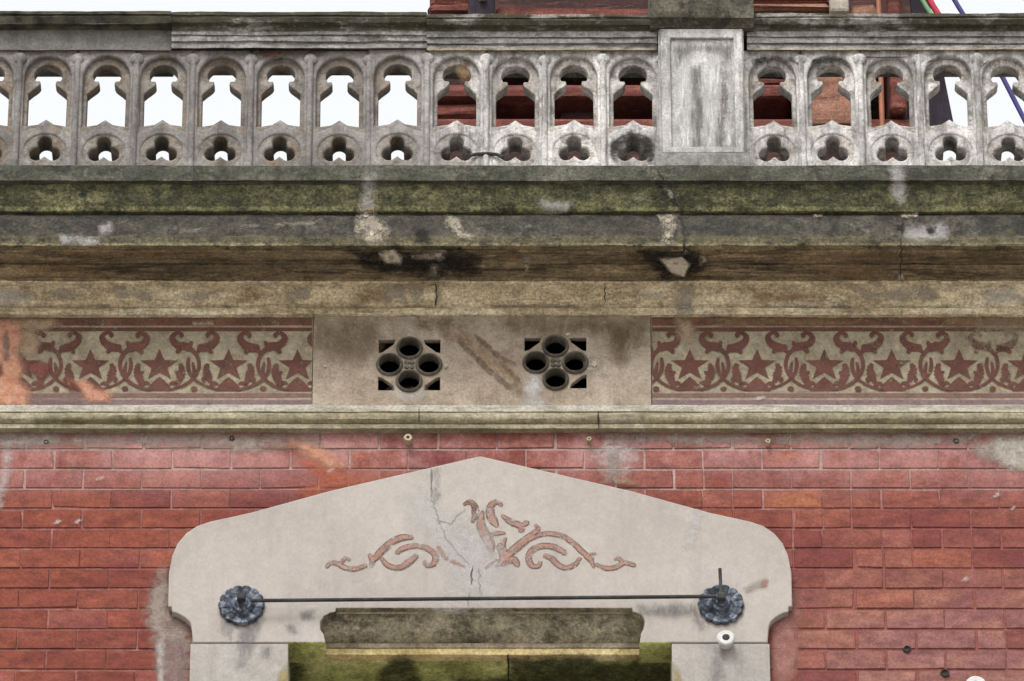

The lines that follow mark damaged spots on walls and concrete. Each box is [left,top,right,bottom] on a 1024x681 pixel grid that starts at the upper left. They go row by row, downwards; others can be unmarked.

spalling [638,214,707,280]
crack [655,168,695,257]
peeling [0,319,110,405]
crack [430,468,482,604]